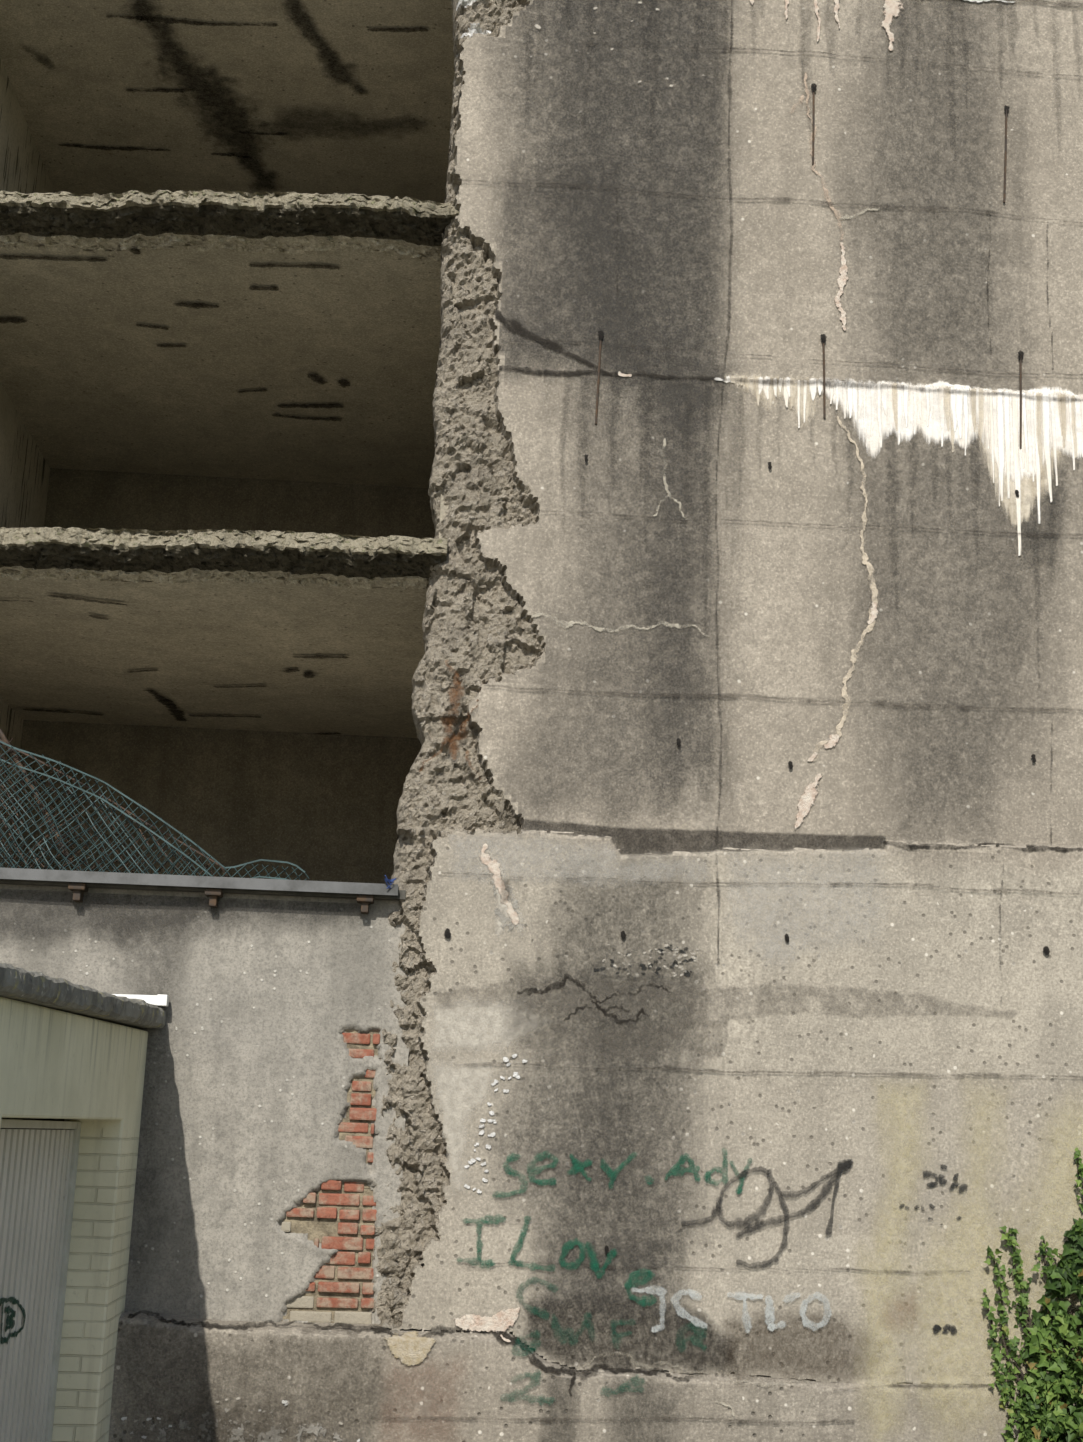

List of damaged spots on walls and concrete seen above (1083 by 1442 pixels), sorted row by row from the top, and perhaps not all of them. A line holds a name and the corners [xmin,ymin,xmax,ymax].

water stain [133,0,418,189]
water stain [506,0,715,802]
water stain [714,0,1083,810]
spalling [0,0,546,1366]
crack [532,613,704,635]
crack [794,416,878,829]
crack [517,944,696,1024]
crack [128,1311,393,1336]
crack [428,1326,689,1396]